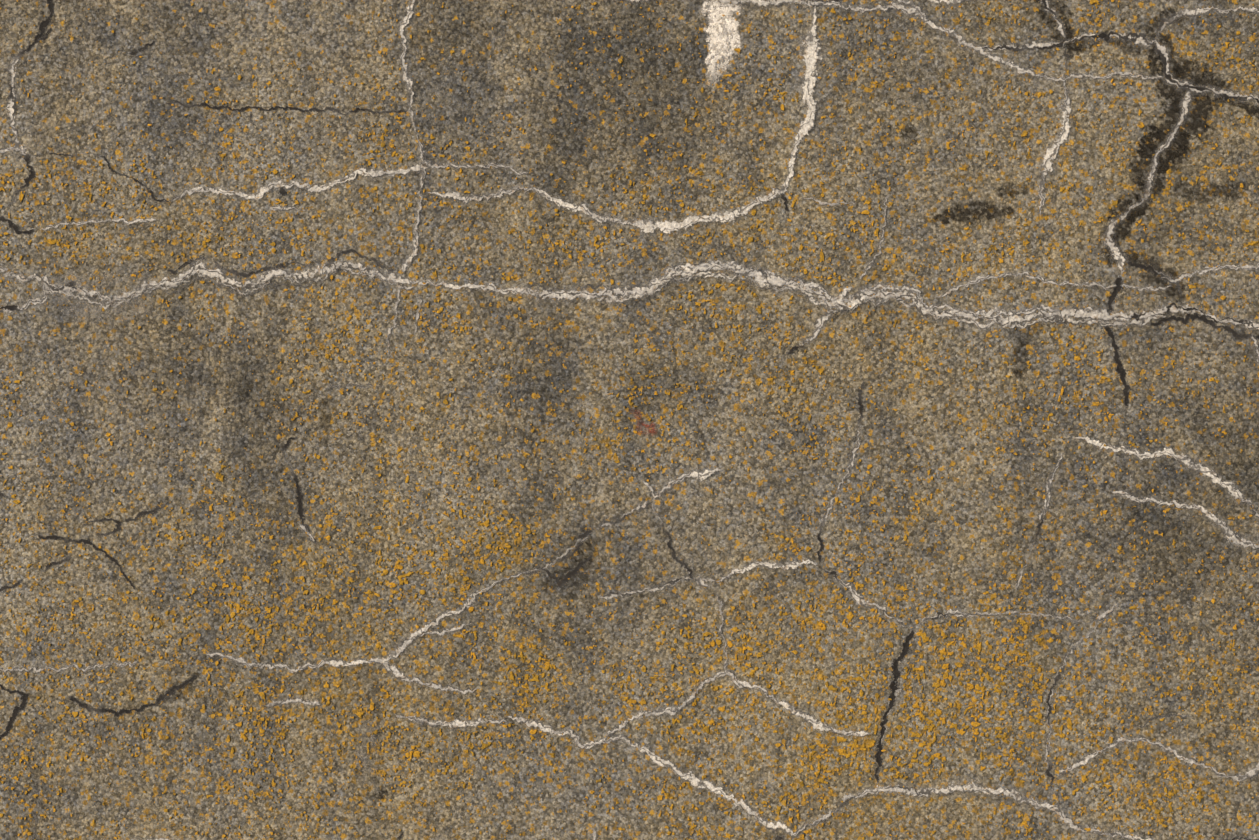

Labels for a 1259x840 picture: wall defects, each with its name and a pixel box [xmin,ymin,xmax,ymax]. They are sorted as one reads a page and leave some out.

crack [0,0,1259,408]
leakage [1036,0,1259,303]
crack [0,381,1259,840]